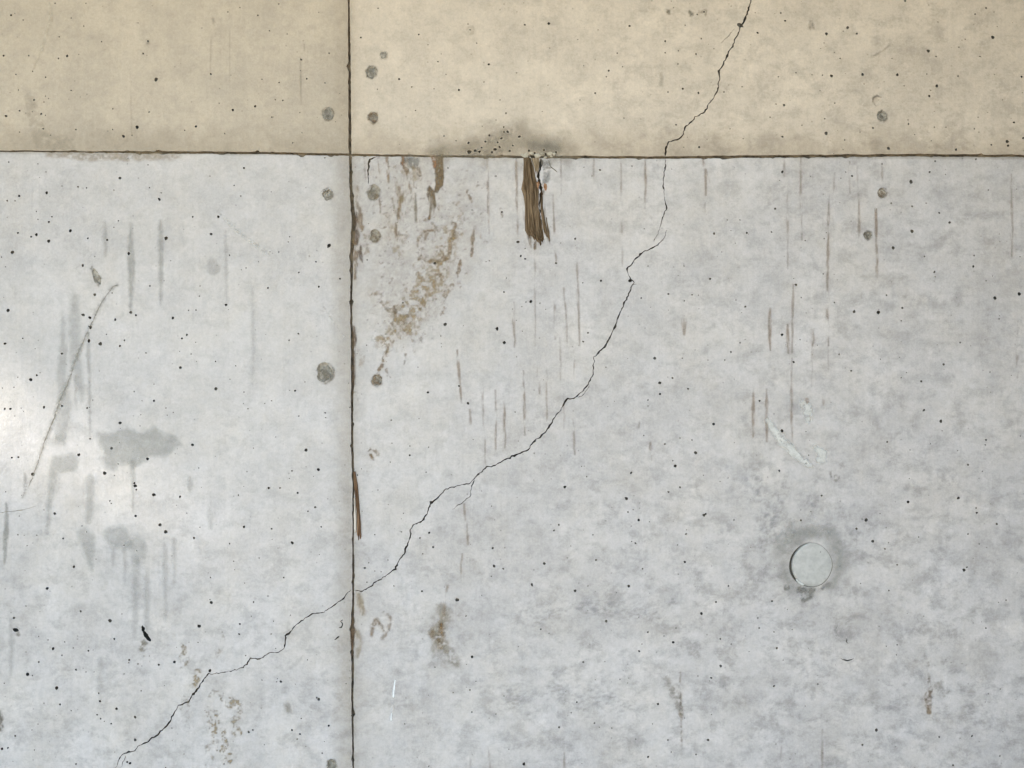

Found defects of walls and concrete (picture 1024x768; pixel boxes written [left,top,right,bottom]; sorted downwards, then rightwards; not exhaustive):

rust [415,154,444,239]
rust [377,227,474,376]
crack [115,0,751,768]